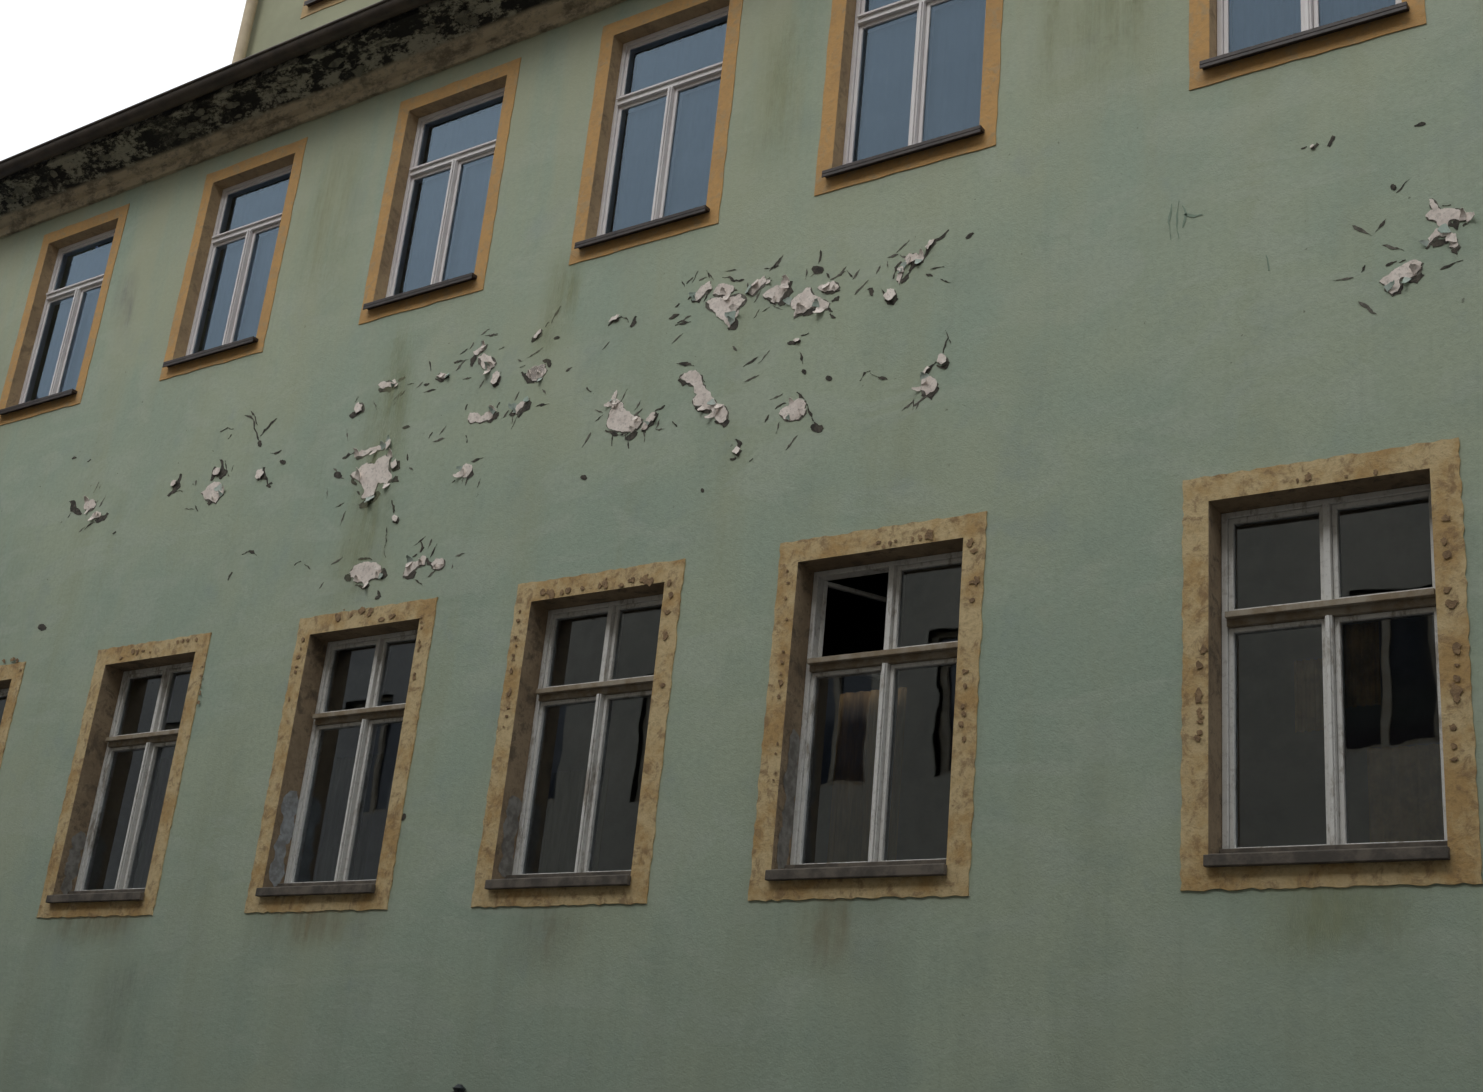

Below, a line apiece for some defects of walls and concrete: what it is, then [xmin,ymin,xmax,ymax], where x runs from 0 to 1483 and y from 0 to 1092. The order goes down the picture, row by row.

peeling [1352,198,1475,297]
peeling [603,314,637,349]
peeling [669,229,974,382]
peeling [904,330,951,409]
peeling [68,482,116,534]
peeling [167,459,233,511]
peeling [245,411,286,488]
peeling [326,306,572,622]
peeling [582,390,677,449]
peeling [677,362,753,461]
peeling [765,392,824,448]
spalling [540,574,673,640]